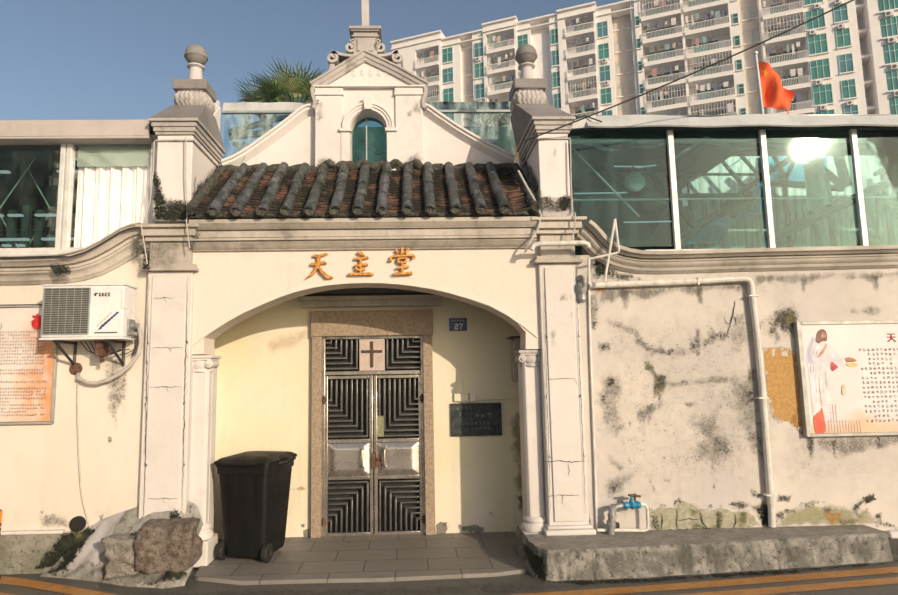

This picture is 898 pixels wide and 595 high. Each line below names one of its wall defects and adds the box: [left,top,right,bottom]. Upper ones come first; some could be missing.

water stain [760,306,799,339]
water stain [600,377,624,436]
water stain [615,317,762,455]
peeling [762,346,803,434]
water stain [696,417,730,465]
water stain [35,513,95,576]
peeling [649,501,760,530]
peeling [776,500,880,527]